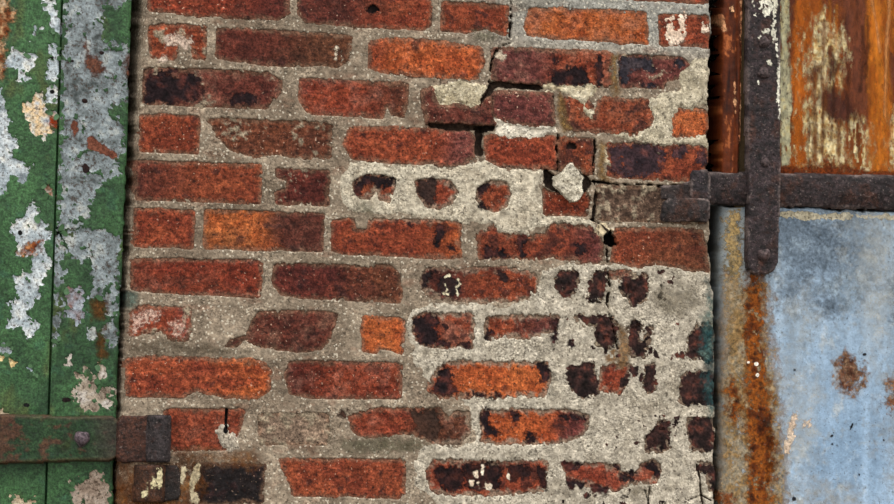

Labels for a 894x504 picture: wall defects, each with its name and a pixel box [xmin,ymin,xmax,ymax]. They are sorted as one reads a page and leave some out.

spalling [143,67,205,105]
spalling [228,92,261,107]
peeling [780,0,872,171]
corrosion [781,0,894,175]
peeling [0,0,130,348]
peeling [0,341,38,378]
peeling [62,354,117,413]
corrosion [713,270,790,504]
corrosion [831,349,869,399]
corrosion [884,378,894,411]
peeling [9,494,36,504]
peeling [68,470,112,504]